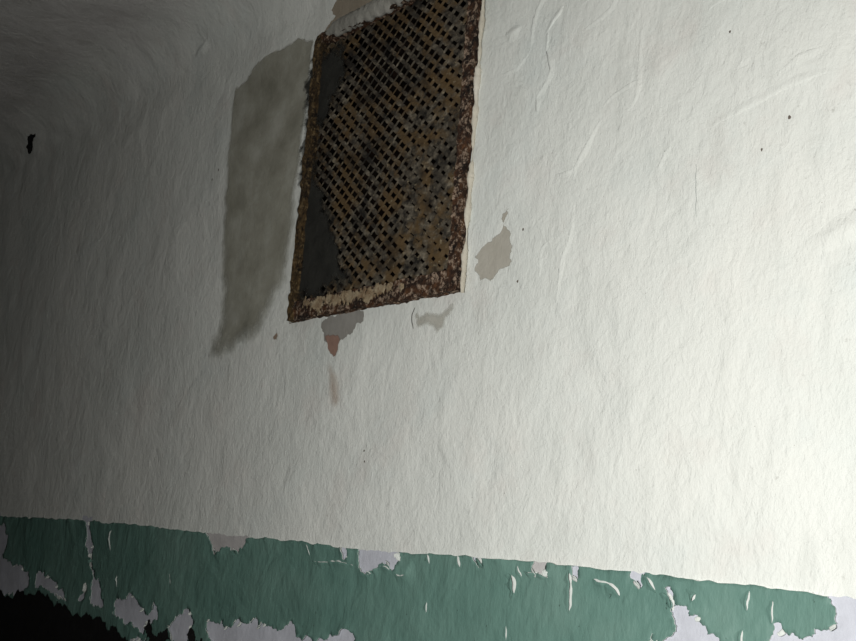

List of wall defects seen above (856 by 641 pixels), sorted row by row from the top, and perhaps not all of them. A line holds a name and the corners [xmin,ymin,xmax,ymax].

flaking render [215,0,372,351]
flaking render [475,211,512,281]
flaking render [302,282,404,356]
peeling [79,515,103,608]
peeling [342,547,401,574]
peeling [531,561,548,577]
peeling [630,571,647,590]
peeling [113,594,158,641]
peeling [167,609,193,641]
peeling [205,617,355,641]
peeling [664,587,719,641]
peeling [770,596,856,641]